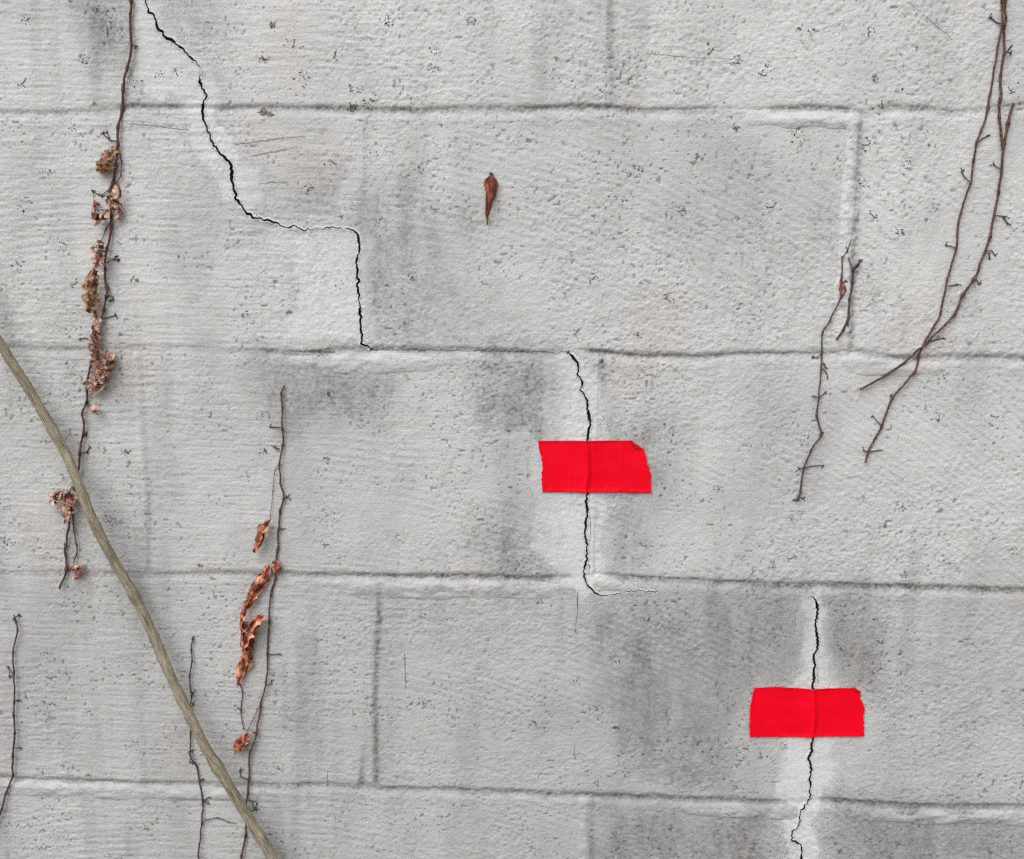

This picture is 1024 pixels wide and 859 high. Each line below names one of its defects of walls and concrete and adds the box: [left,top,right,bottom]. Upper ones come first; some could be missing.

crack [143,0,594,441]
crack [575,492,656,633]
crack [809,594,821,689]
crack [789,737,816,859]